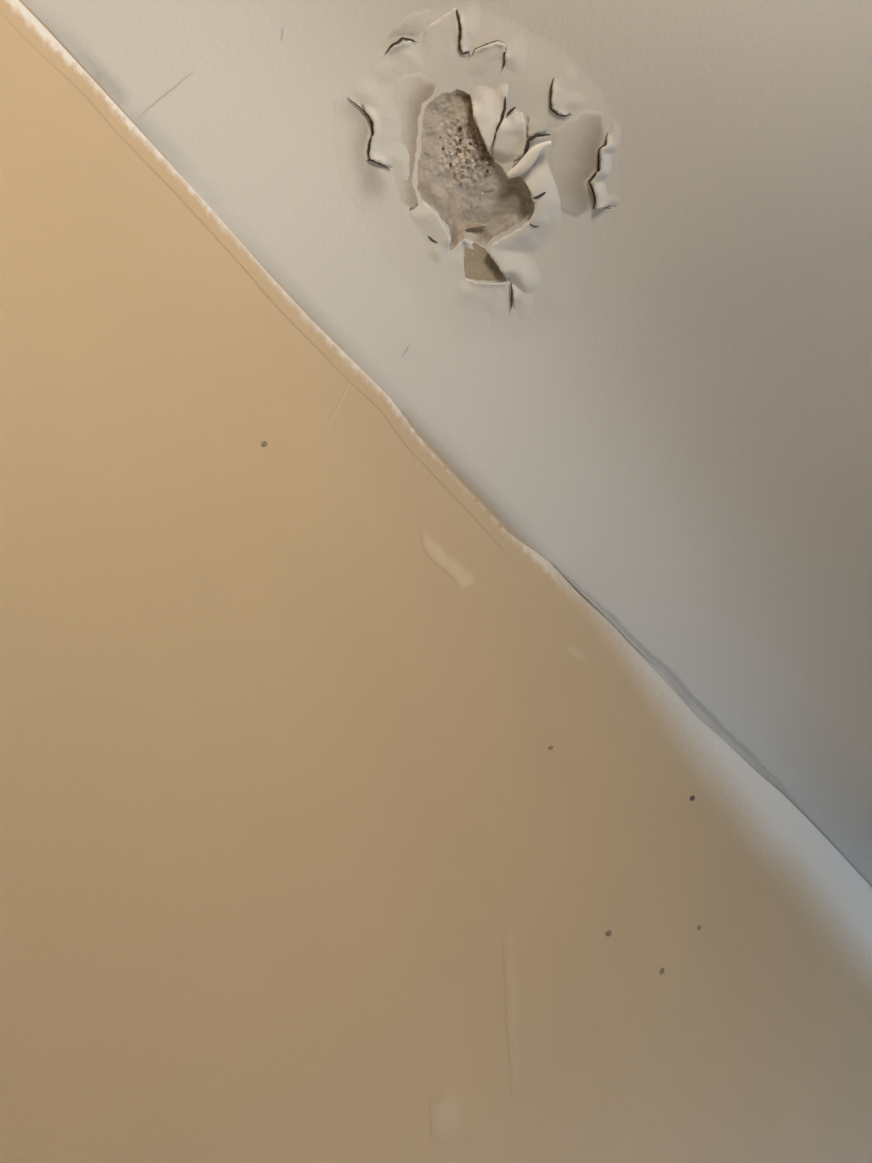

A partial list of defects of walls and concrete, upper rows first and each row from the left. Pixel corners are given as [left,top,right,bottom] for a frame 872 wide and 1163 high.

peeling [332,0,621,321]